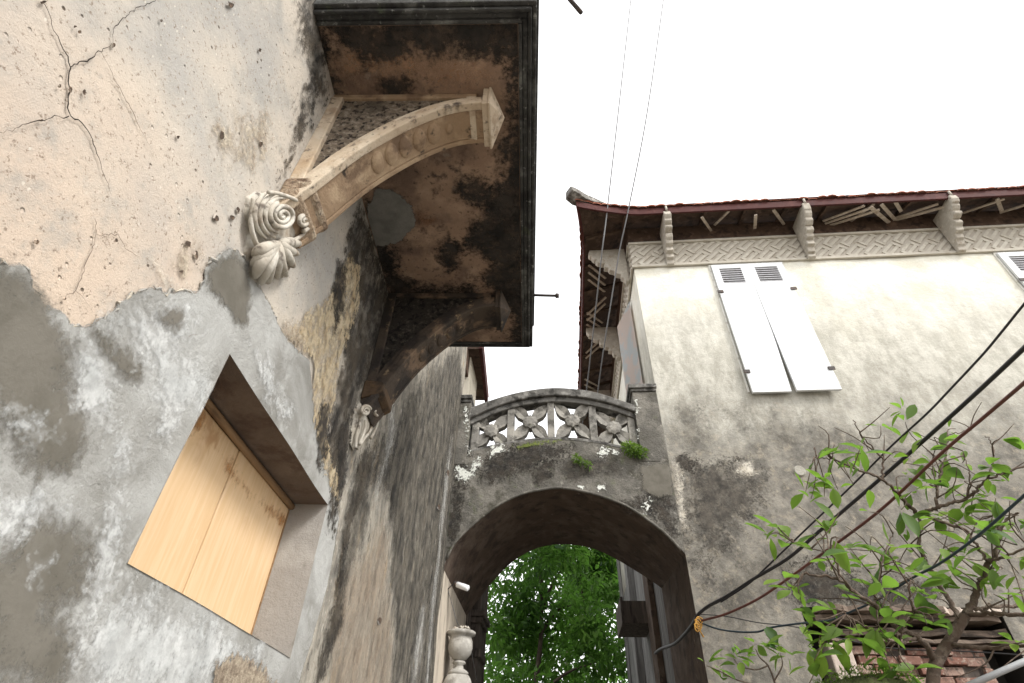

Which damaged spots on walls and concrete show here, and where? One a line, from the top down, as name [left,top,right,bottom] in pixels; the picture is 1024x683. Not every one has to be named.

crack [0,0,156,194]
crack [65,218,139,304]
spalling [48,241,249,327]
peeling [256,253,361,506]
leakage [275,0,622,683]
leakage [621,453,772,595]